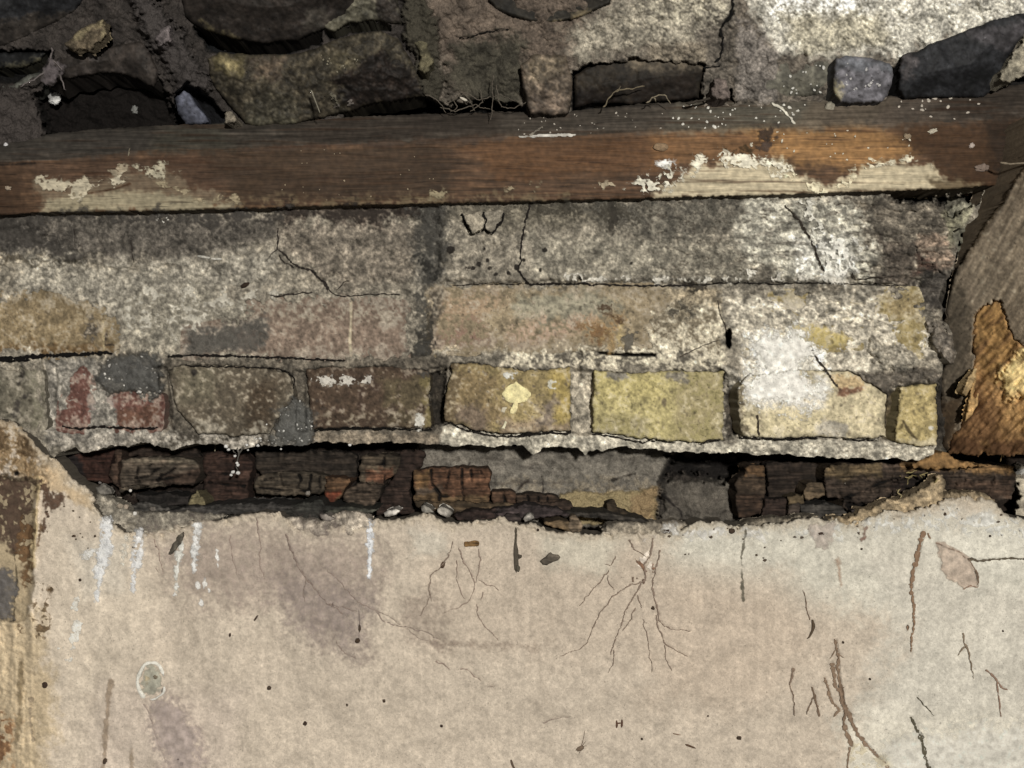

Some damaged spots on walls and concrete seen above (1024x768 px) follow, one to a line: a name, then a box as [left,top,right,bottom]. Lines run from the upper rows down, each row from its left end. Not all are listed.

crack [269,228,400,297]
crack [454,204,899,357]
damp [80,515,144,603]
spalling [94,483,228,534]
damp [173,521,210,606]
spalling [287,506,403,537]
damp [365,521,374,579]
spalling [421,502,454,517]
spalling [600,517,687,538]
spalling [709,473,995,550]
crack [562,538,690,673]
crack [958,633,1008,716]